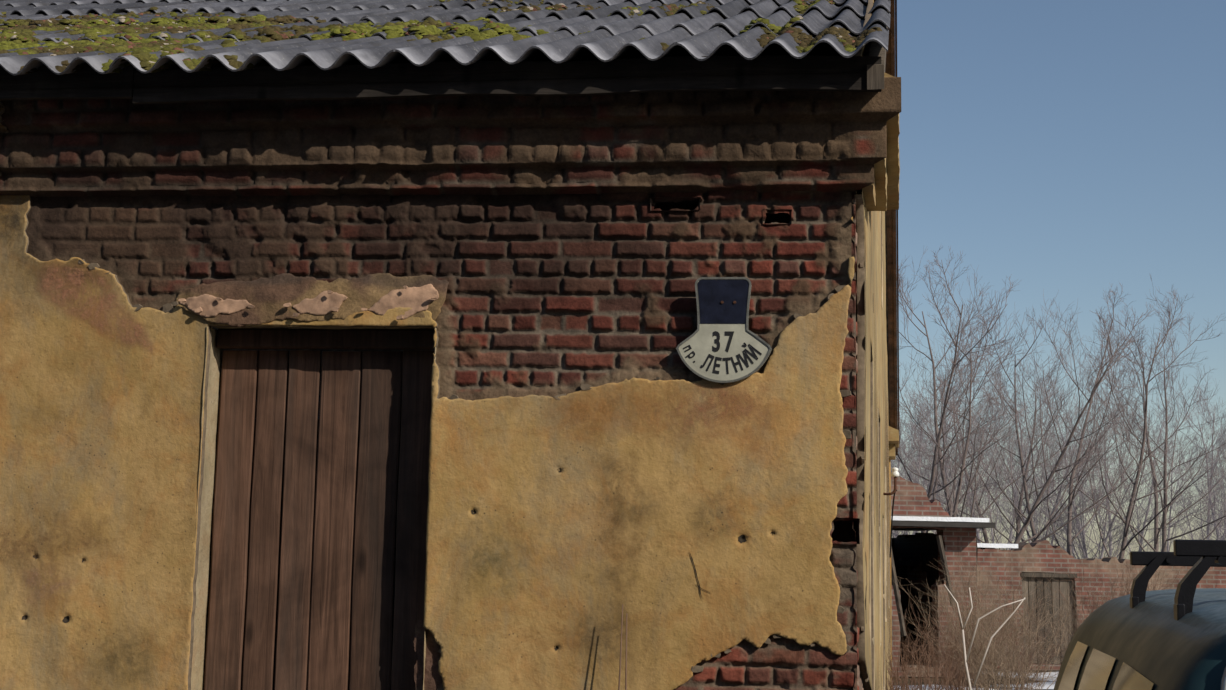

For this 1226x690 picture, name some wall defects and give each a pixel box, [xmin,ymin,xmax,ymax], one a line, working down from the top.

flaking render [0,77,901,690]
crack [690,554,710,598]